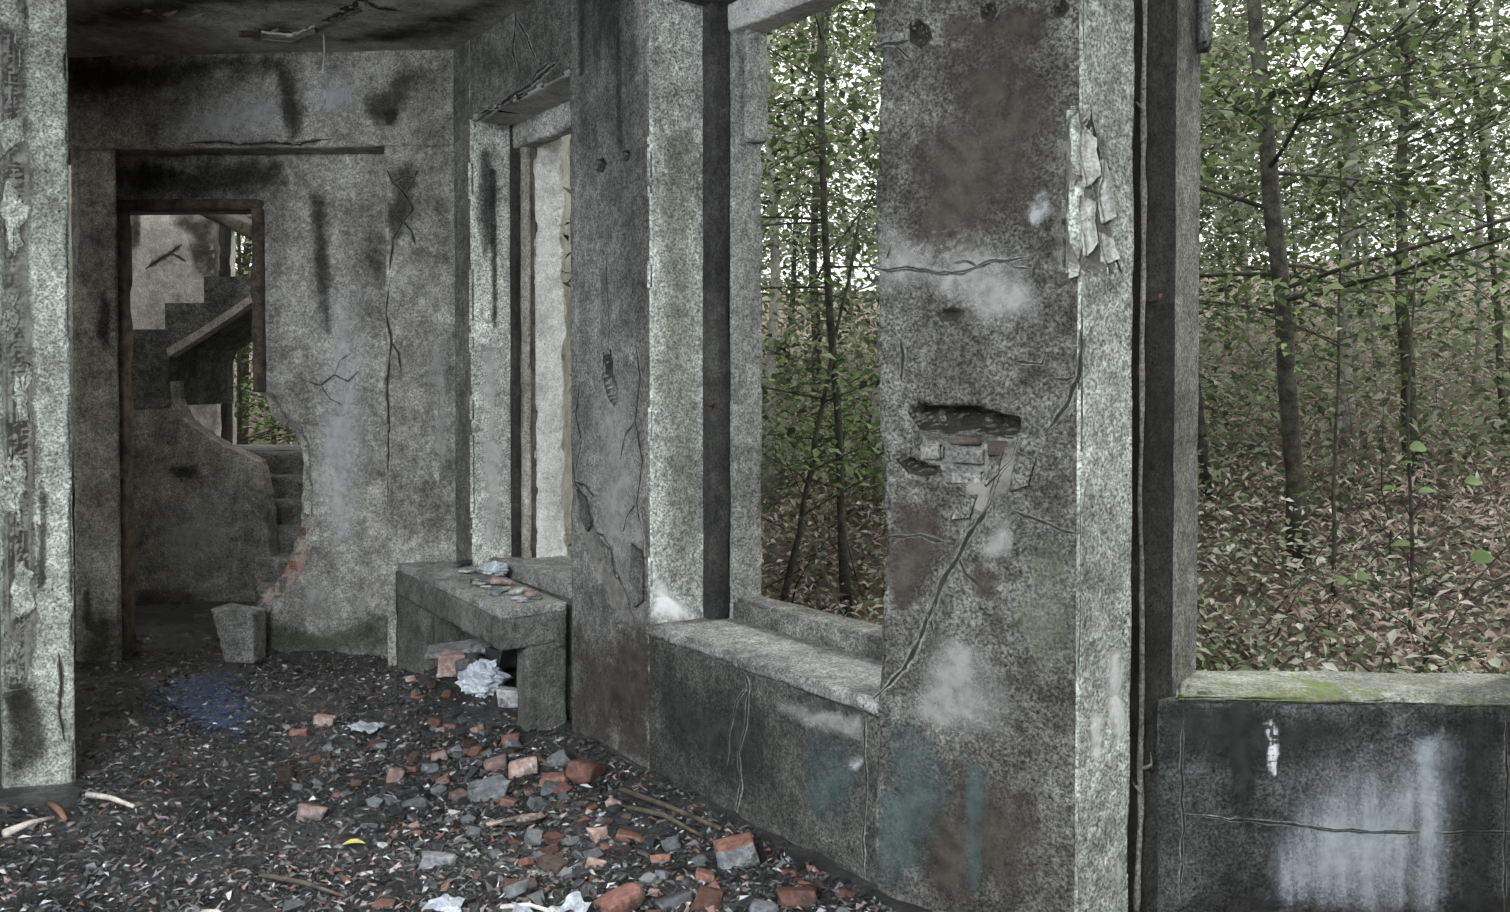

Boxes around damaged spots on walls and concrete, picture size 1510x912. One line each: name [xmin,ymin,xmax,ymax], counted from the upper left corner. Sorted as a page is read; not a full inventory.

crack [321,0,401,21]
damp [368,72,425,124]
peeling [1057,112,1120,279]
damp [311,197,328,322]
crack [868,247,1030,277]
crack [307,170,419,502]
spalling [895,401,1036,520]
crack [861,326,1086,880]
damp [1162,701,1380,825]
damp [1178,717,1510,912]